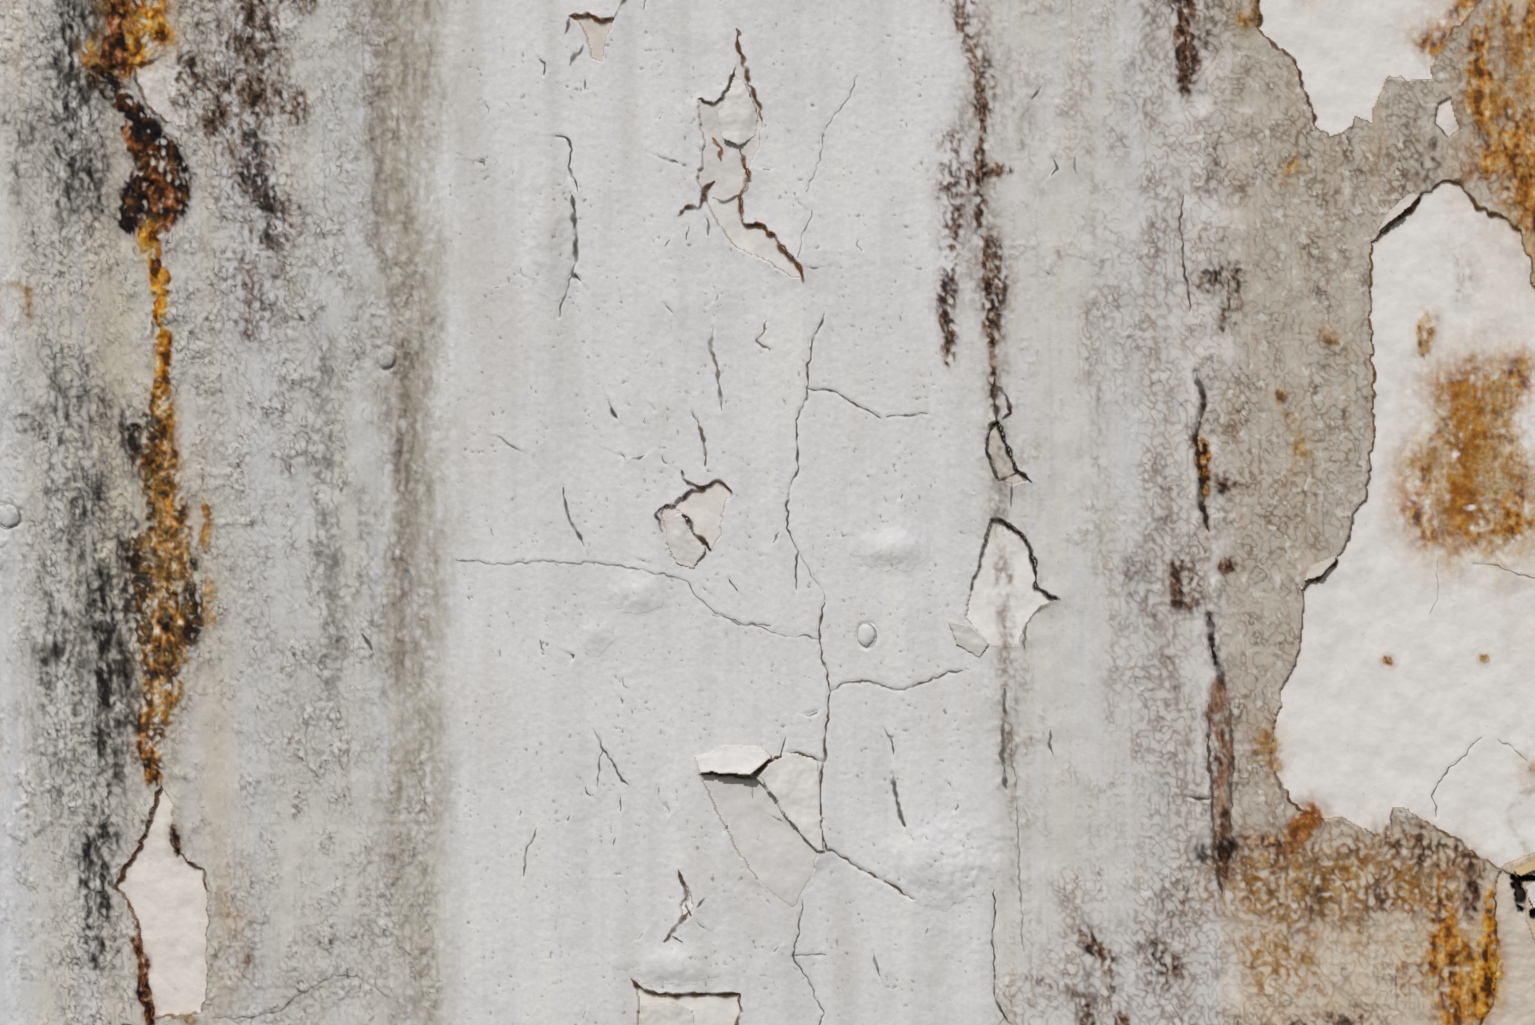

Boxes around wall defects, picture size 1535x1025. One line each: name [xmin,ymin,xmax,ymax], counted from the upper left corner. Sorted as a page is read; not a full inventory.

water stain [4,0,113,229]
corrosion [80,0,216,786]
water stain [170,0,317,340]
crack [555,135,581,311]
corrosion [937,0,1012,397]
peeling [1255,0,1481,137]
water stain [32,477,142,969]
spalling [113,786,209,1018]
crack [455,313,961,899]
crack [999,688,1007,788]
corrosion [1196,678,1504,1025]
peeling [1272,178,1535,1025]